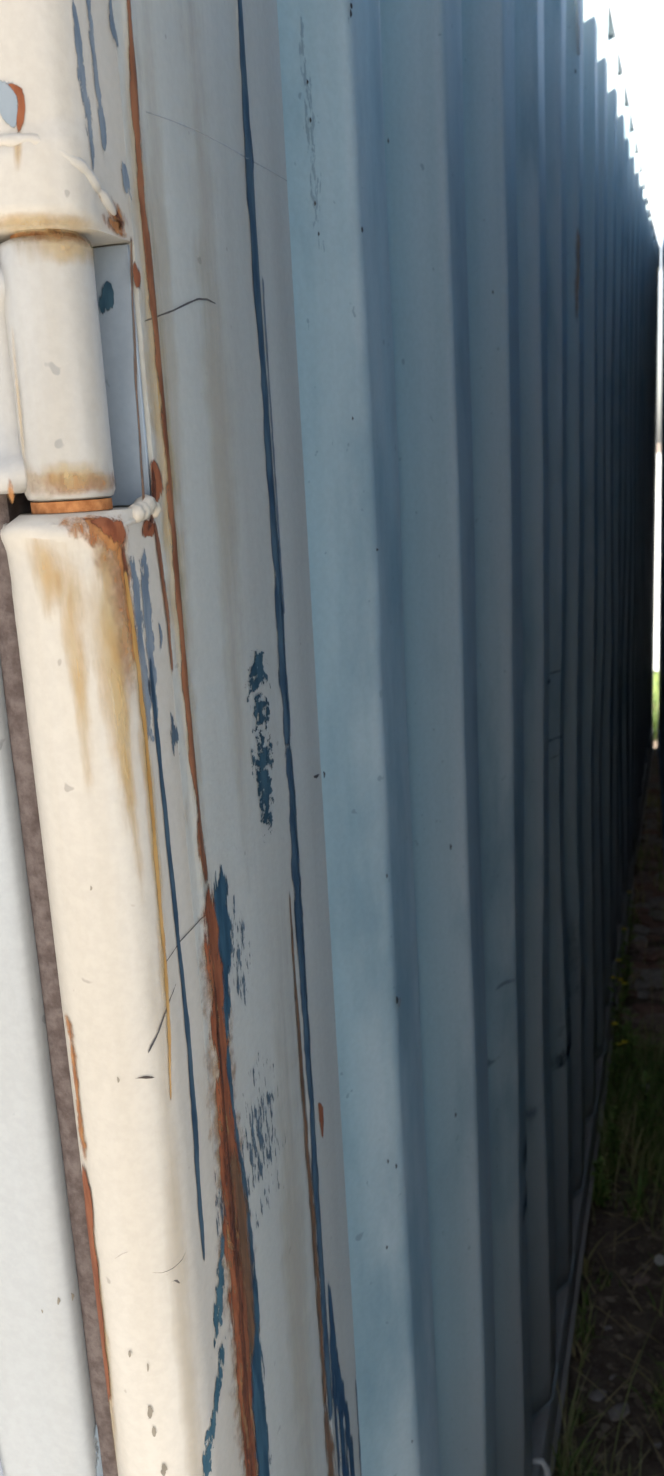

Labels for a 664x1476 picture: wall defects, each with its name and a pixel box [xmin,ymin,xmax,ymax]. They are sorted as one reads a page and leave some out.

peeling [0,80,25,131]
rust [9,219,82,255]
rust [47,468,107,493]
rust [62,0,259,1476]
peeling [228,895,250,1004]
peeling [241,1053,286,1227]
peeling [202,1173,228,1476]